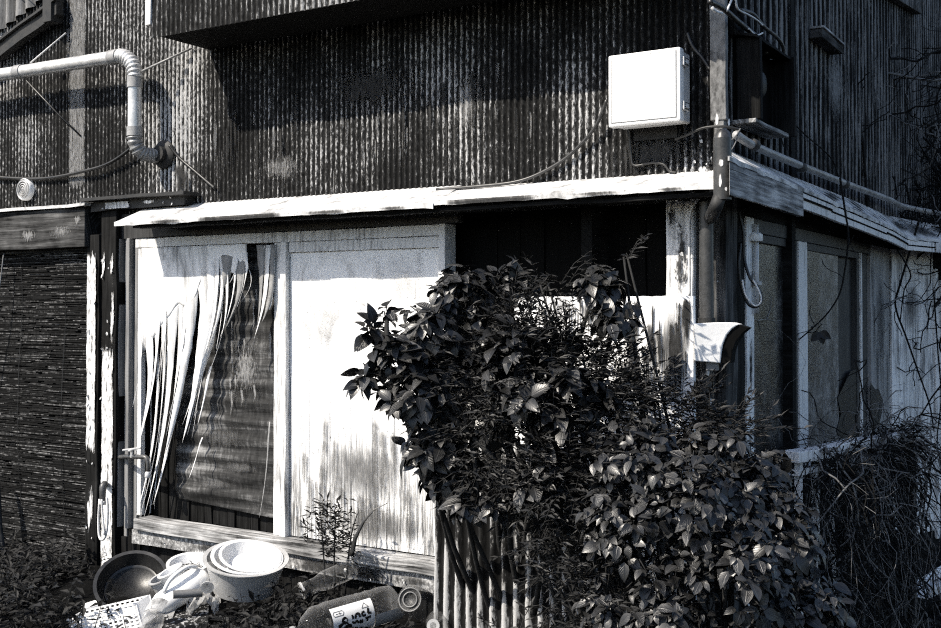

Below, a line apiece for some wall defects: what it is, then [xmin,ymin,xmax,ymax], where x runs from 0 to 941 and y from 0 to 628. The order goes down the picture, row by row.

leakage [292,420,415,542]